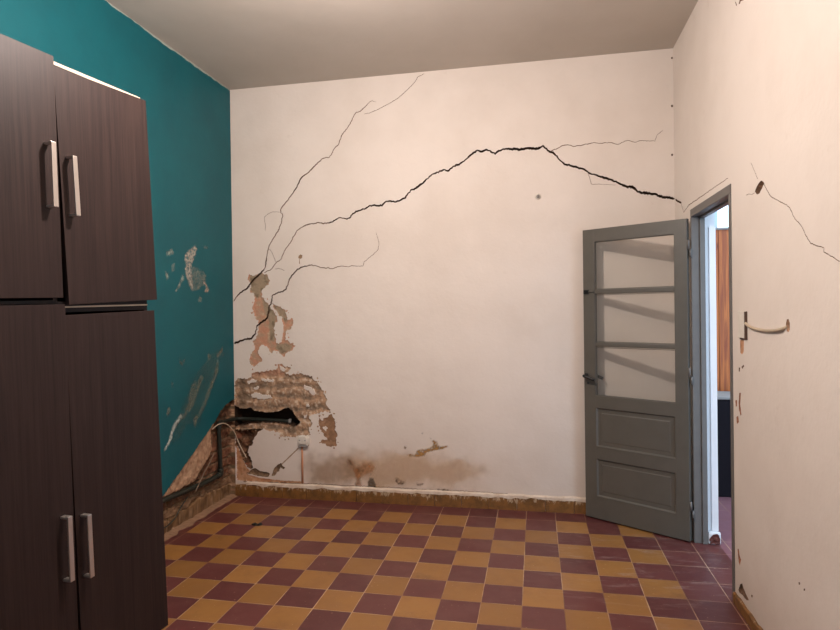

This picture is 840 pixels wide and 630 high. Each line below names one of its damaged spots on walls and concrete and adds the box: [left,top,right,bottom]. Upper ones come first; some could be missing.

crack [233,74,728,344]
crack [747,166,840,262]
peeling [176,247,208,299]
flaking render [163,273,339,529]
water stain [404,441,447,457]